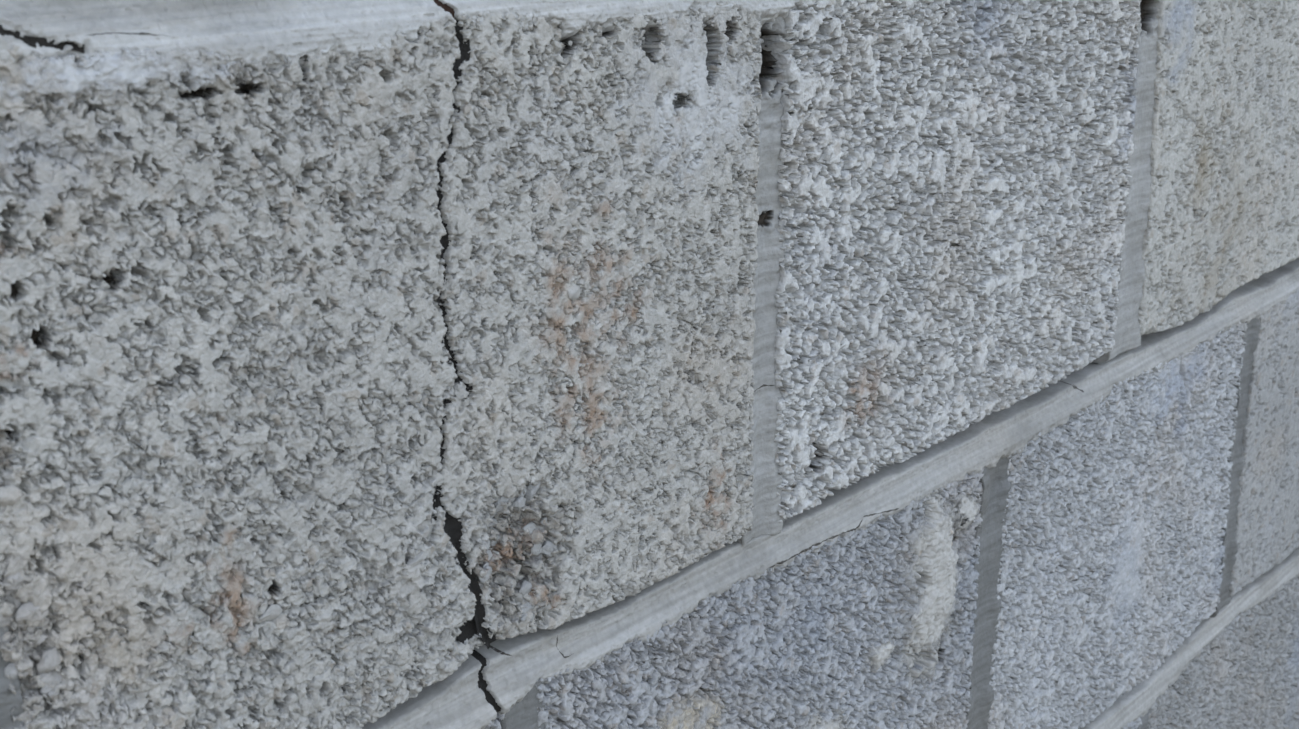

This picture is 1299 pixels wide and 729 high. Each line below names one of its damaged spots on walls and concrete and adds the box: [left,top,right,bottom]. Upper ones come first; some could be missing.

crack [431,0,512,719]